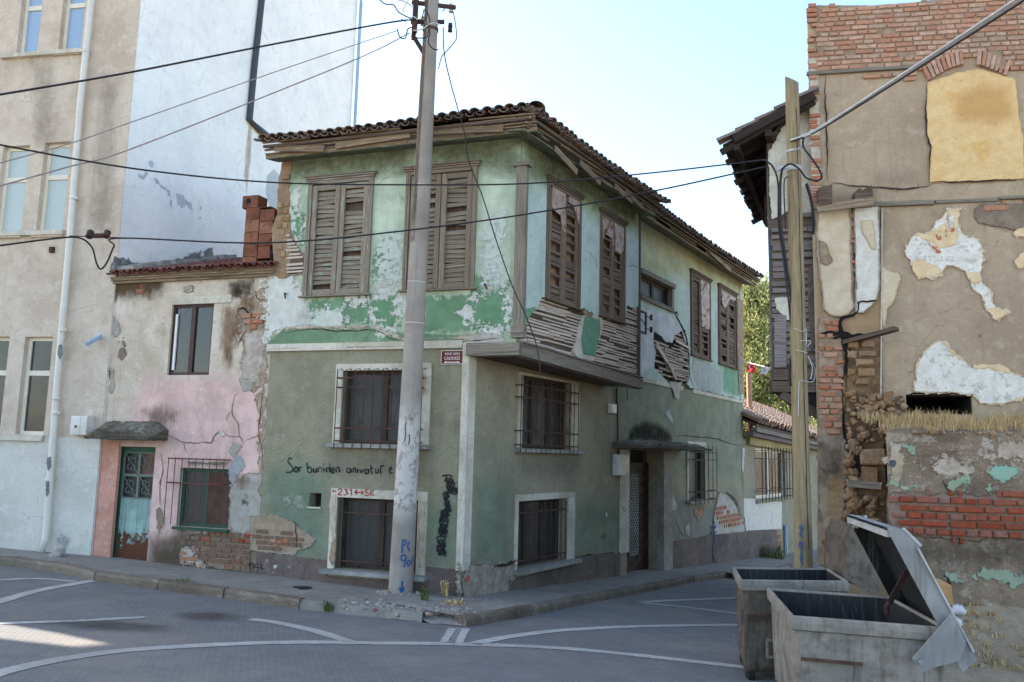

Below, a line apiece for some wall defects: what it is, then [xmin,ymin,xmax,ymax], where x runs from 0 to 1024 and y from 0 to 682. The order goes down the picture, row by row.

peeling [138,160,202,219]
crack [824,75,929,228]
peeling [424,209,513,343]
flaking render [805,0,1024,566]
peeling [179,169,407,573]
crack [159,375,266,499]
spalling [455,558,518,597]
spalling [685,491,746,537]
peeling [942,568,965,584]